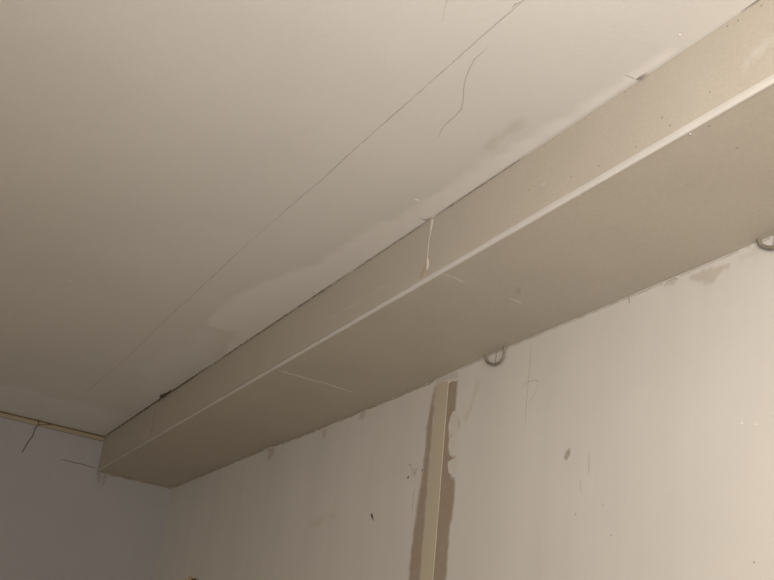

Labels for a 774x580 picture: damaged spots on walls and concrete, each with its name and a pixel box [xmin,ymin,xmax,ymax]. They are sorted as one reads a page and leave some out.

crack [76,0,524,436]
spalling [663,258,734,290]